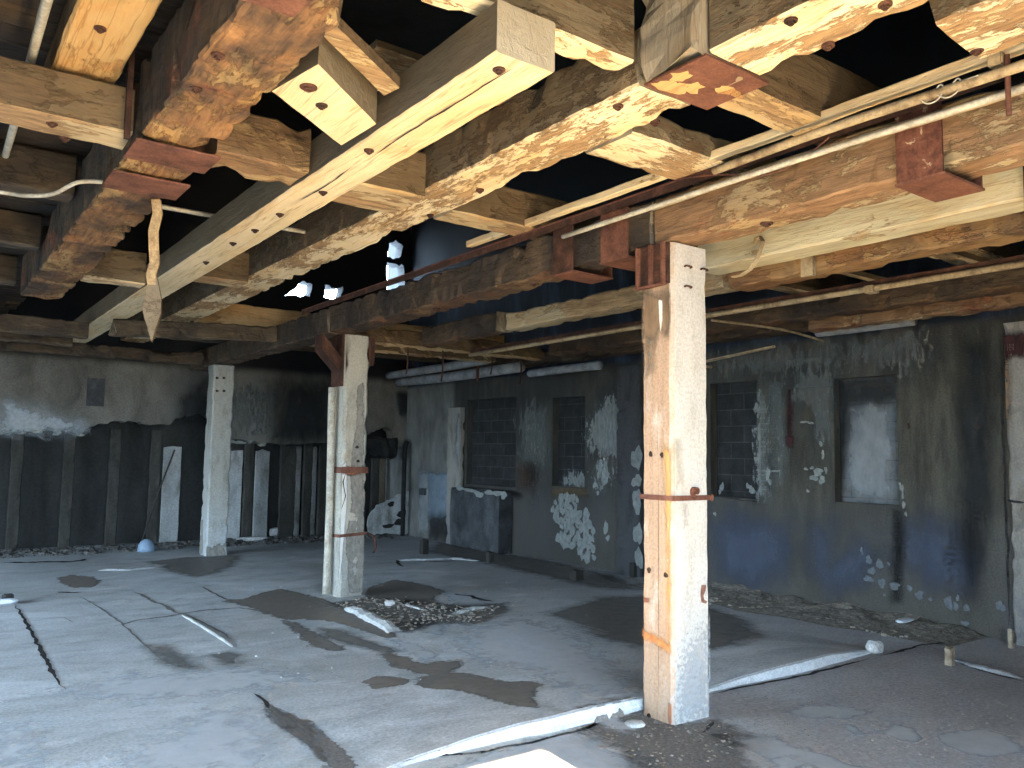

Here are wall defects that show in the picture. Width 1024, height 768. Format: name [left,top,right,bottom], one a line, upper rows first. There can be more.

leakage [2,403,84,433]
peeling [593,459,608,495]
peeling [804,441,827,493]
spalling [382,501,406,528]
peeling [551,492,610,564]
peeling [631,445,643,569]
leakage [430,543,644,646]
crack [15,606,66,689]
leakage [223,589,544,708]
leakage [708,609,759,649]
crack [254,693,270,708]